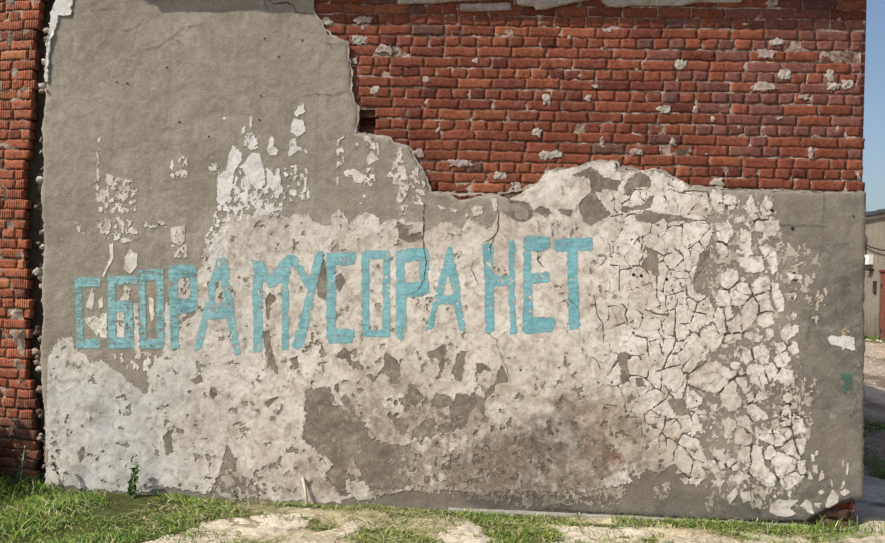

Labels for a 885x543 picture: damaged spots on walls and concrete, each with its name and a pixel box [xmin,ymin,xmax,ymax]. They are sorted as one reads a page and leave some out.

peeling [288,103,307,157]
peeling [95,137,188,277]
peeling [384,147,425,205]
crack [414,202,427,292]
crack [471,209,499,283]
peeling [573,167,621,226]
peeling [624,172,651,197]
peeling [621,196,693,225]
peeling [618,352,645,387]
crack [535,162,825,523]
peeling [301,387,414,494]
peeling [705,451,861,529]